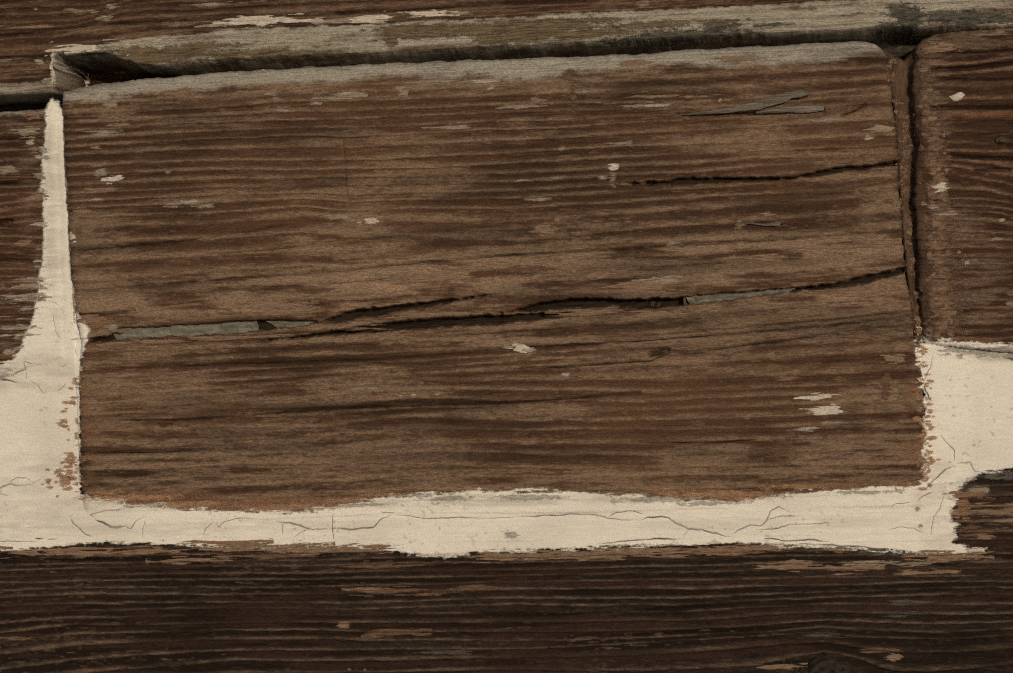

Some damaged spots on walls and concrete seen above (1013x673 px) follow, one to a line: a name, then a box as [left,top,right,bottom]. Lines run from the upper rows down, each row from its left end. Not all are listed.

crack [628,161,899,185]
crack [791,269,903,292]
crack [93,287,193,341]
crack [257,298,689,338]
crack [535,321,865,369]
crack [282,512,467,539]
crack [522,511,670,544]